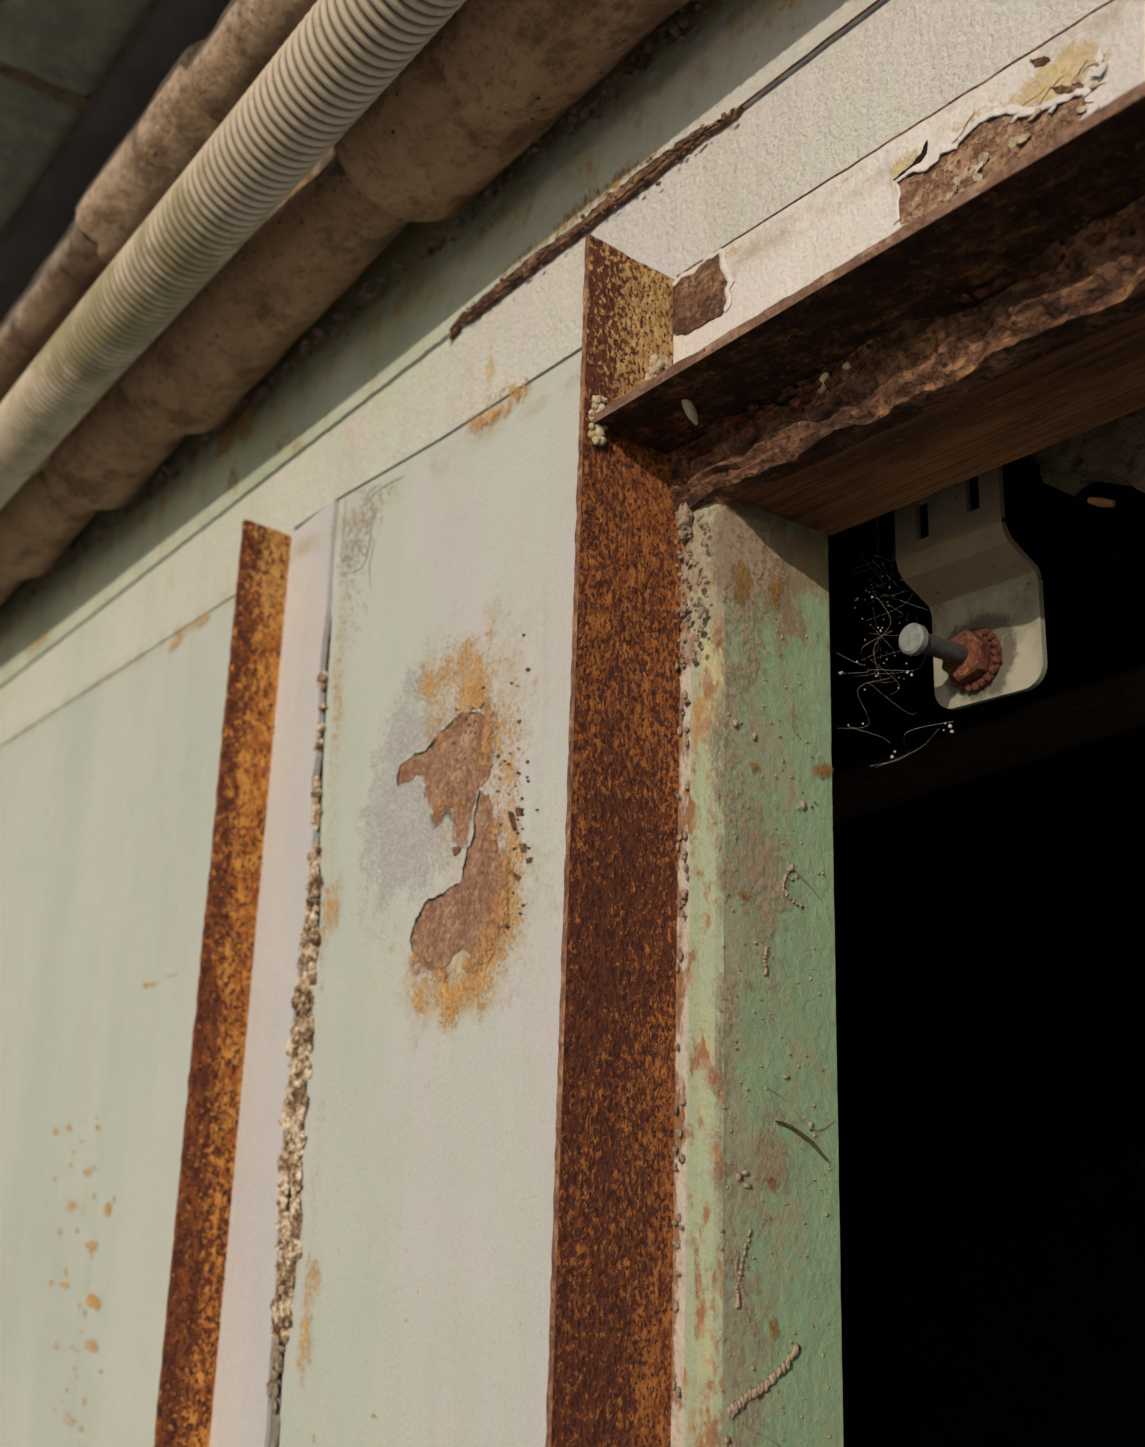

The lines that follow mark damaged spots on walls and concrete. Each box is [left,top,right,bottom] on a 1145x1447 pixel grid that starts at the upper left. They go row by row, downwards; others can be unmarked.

peeling [448,102,742,343]
corrosion [449,105,744,340]
corrosion [672,0,1115,335]
peeling [888,40,1111,226]
corrosion [950,628,1002,693]
peeling [358,630,539,1029]
corrosion [79,1294,100,1314]